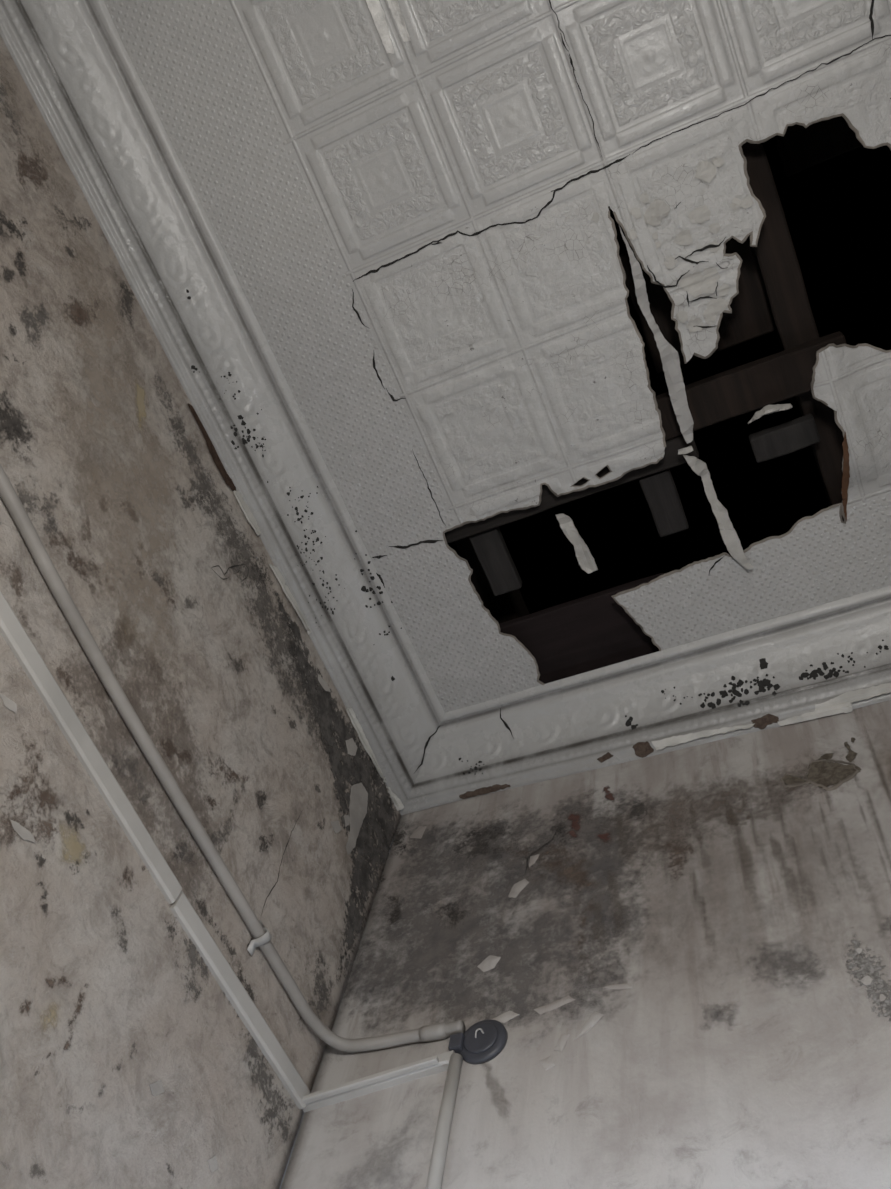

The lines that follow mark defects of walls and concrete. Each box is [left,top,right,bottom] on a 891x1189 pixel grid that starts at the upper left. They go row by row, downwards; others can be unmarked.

leakage [0,211,31,282]
crack [352,0,891,401]
peeling [628,192,730,333]
crack [608,206,728,455]
leakage [0,391,32,458]
peeling [748,404,792,423]
leakage [9,244,807,1027]
peeling [652,723,755,750]
peeling [778,683,891,726]
leakage [0,745,90,872]
leakage [44,976,86,1050]
leakage [245,1034,291,1143]